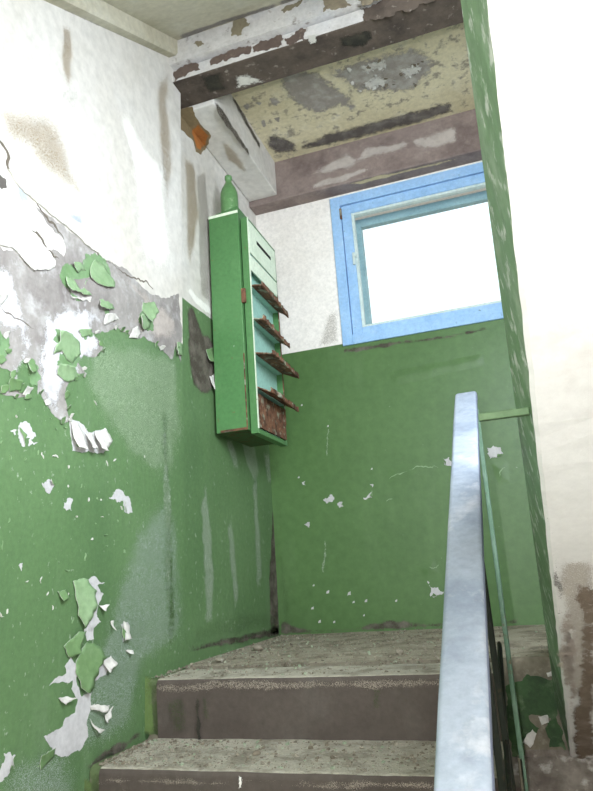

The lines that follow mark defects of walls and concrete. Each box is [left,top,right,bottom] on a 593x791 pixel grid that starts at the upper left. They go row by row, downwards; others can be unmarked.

peeling [210,28,317,65]
water stain [340,32,372,48]
peeling [323,0,436,22]
peeling [236,75,263,88]
corrosion [181,107,211,155]
water stain [216,105,250,171]
water stain [234,99,453,155]
crack [0,141,153,289]
peeling [0,207,183,454]
water stain [555,560,593,717]
peeling [40,576,118,770]
peeling [506,585,593,759]